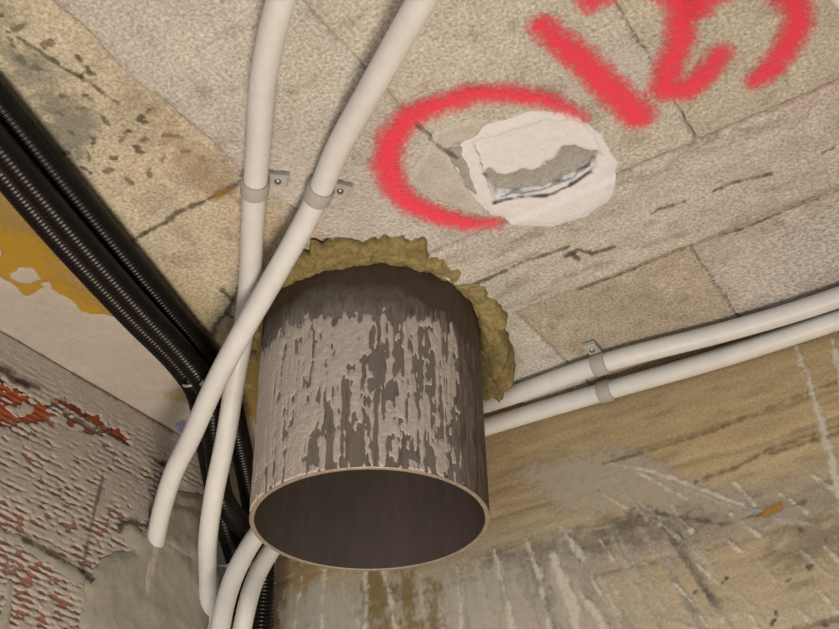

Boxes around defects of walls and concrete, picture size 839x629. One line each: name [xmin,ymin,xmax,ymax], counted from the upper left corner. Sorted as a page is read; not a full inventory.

crack [7,31,114,101]
spalling [408,117,490,216]
crack [132,183,239,241]
damp [244,361,260,419]
flaking render [0,268,190,629]
flaking render [178,450,204,495]
flaking render [229,460,242,507]
flaking render [246,417,256,453]
damp [566,532,585,561]
damp [381,571,398,629]
damp [527,542,555,629]
damp [549,552,609,629]